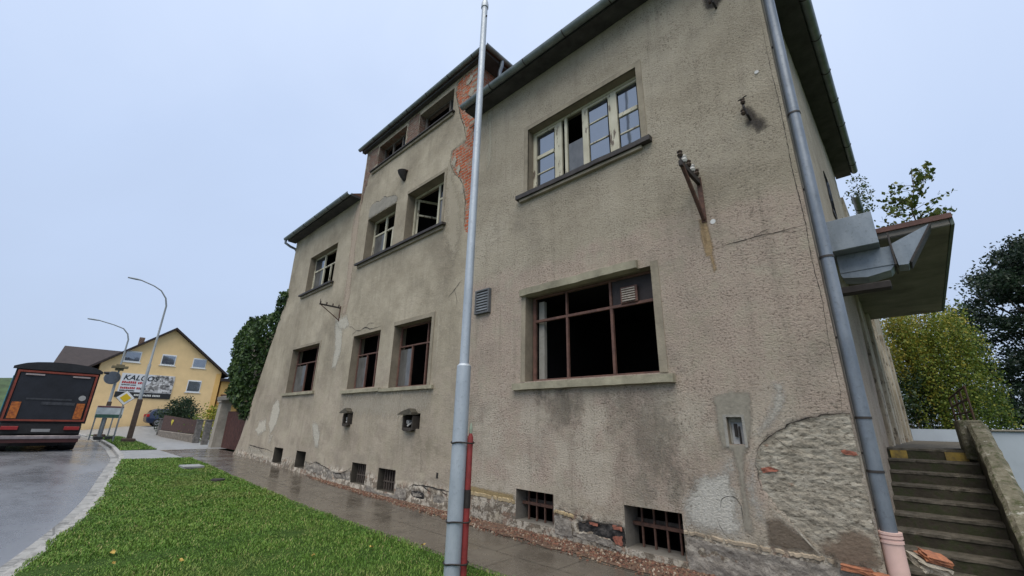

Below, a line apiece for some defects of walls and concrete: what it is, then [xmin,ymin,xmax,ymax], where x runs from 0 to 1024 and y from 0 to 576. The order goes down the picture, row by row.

water stain [746,107,766,131]
peeling [445,70,474,260]
corrosion [700,220,716,271]
crack [716,18,843,413]
peeling [247,400,280,461]
spalling [686,413,889,576]
spalling [573,520,626,551]